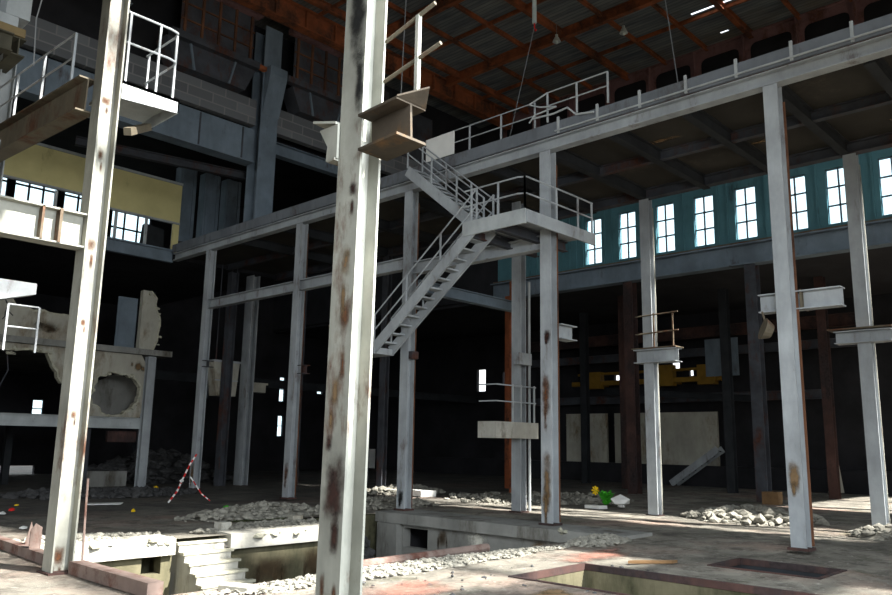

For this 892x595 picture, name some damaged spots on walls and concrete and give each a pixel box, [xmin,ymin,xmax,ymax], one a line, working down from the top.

corrosion [340,287,349,327]
corrosion [782,102,815,546]
corrosion [332,353,344,402]
corrosion [543,233,561,523]
corrosion [325,460,342,550]